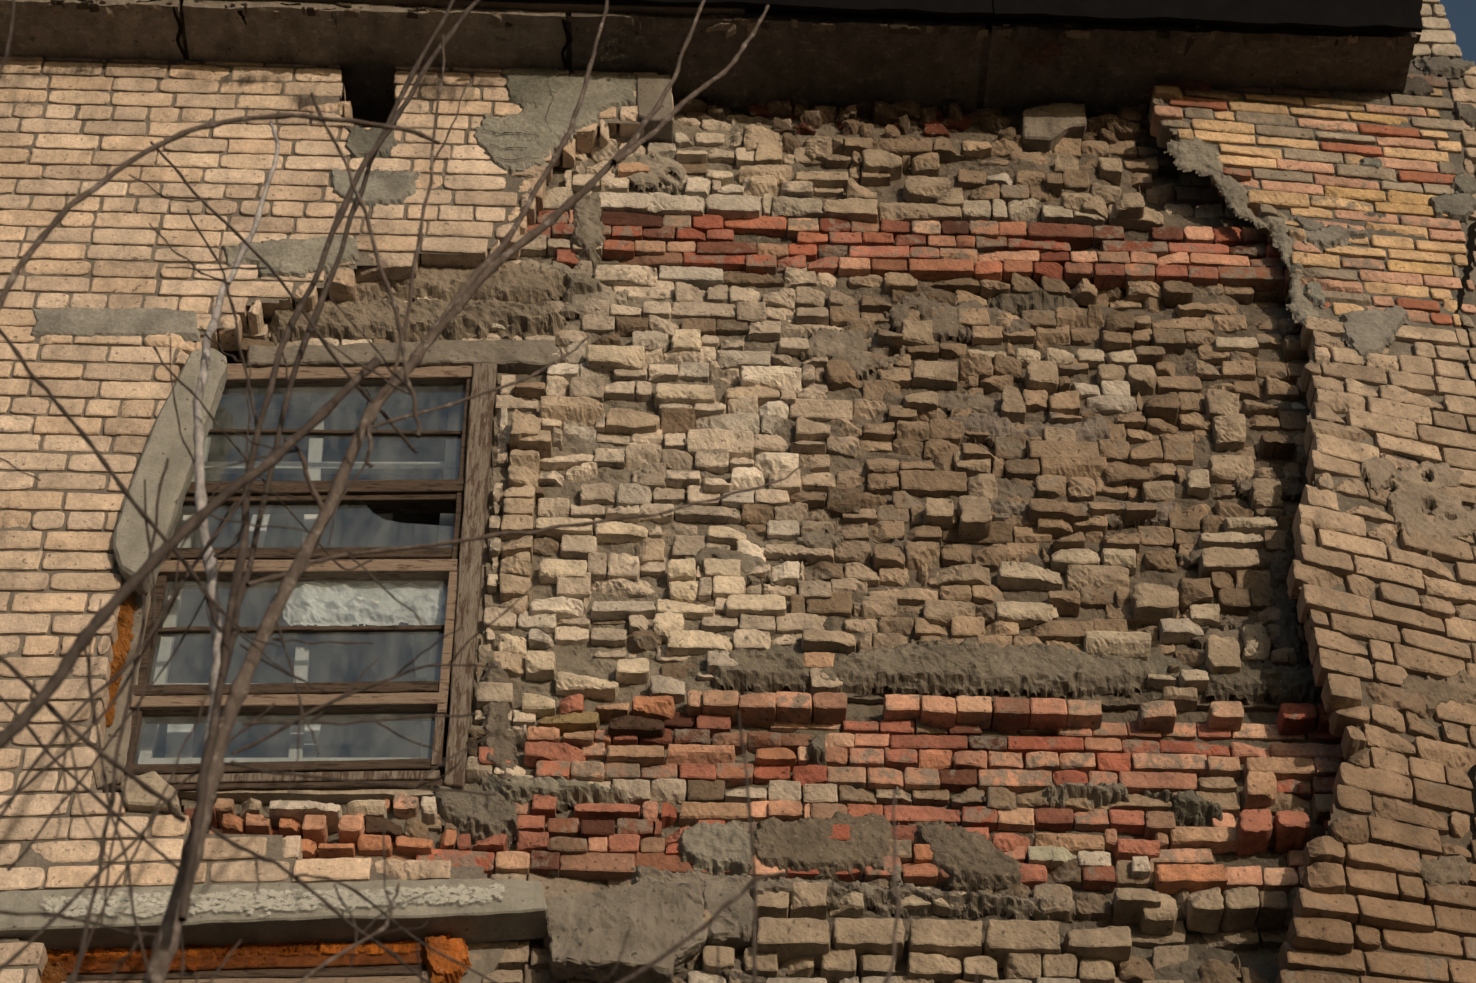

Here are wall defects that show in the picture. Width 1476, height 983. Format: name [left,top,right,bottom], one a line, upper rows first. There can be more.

crack [1455,221,1476,386]
spalling [182,67,1347,983]
crack [1466,764,1476,854]
peeling [40,889,171,918]